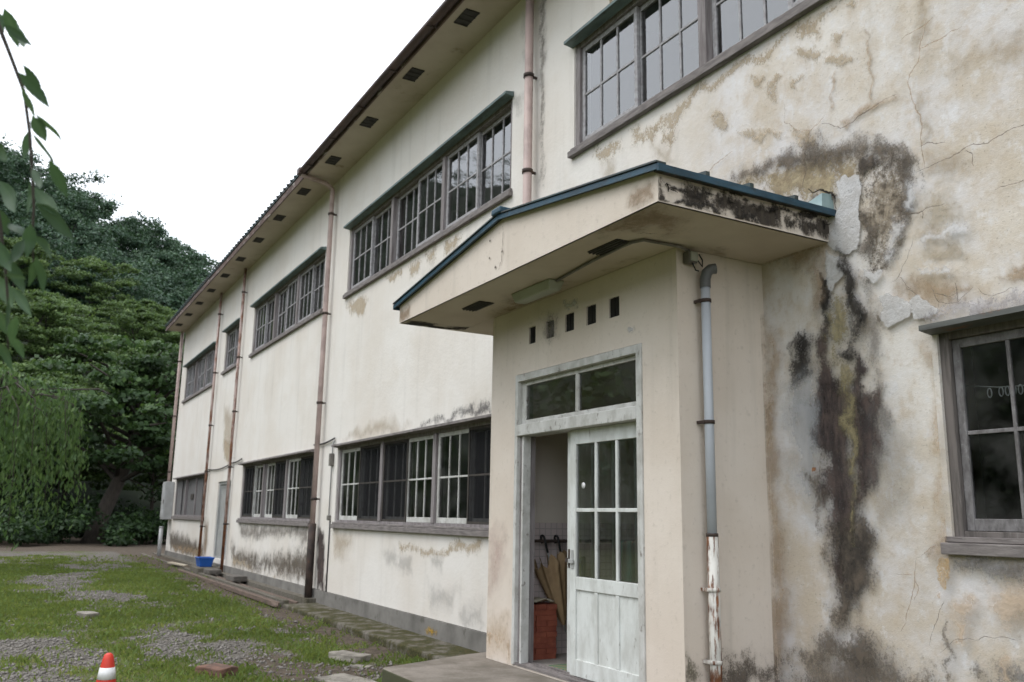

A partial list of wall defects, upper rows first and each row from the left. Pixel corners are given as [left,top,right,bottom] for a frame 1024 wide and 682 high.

damp [633,0,855,145]
crack [784,17,1023,228]
flaking render [739,154,924,291]
crack [887,204,1016,311]
damp [420,402,489,427]
damp [633,129,954,682]
damp [169,532,203,556]
damp [230,523,325,591]
damp [400,539,482,556]
crack [899,545,938,631]
crack [930,602,1018,653]
mould [970,661,1024,682]